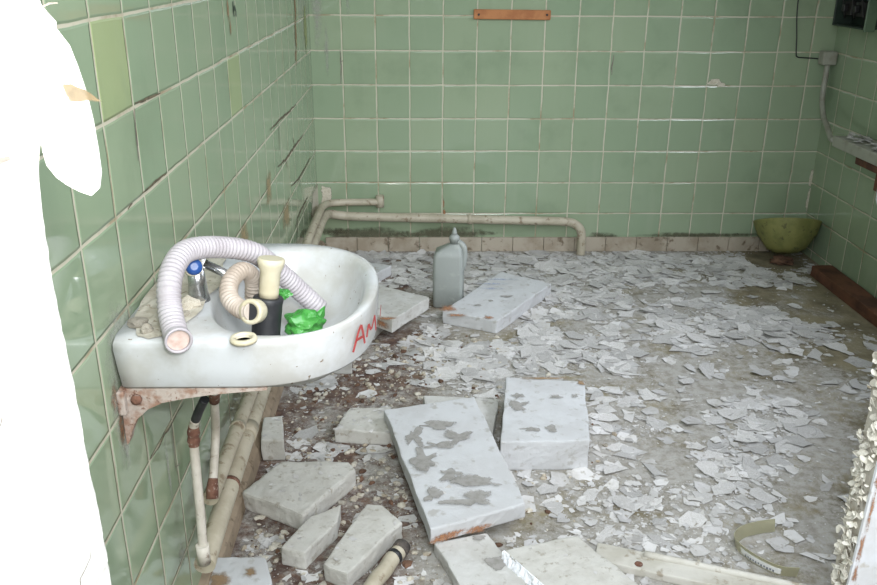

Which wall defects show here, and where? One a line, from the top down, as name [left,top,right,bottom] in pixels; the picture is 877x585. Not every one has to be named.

crack [128,173,167,209]
corrosion [112,386,125,443]
corrosion [208,394,220,405]
peeling [831,351,877,585]
spalling [501,550,544,585]